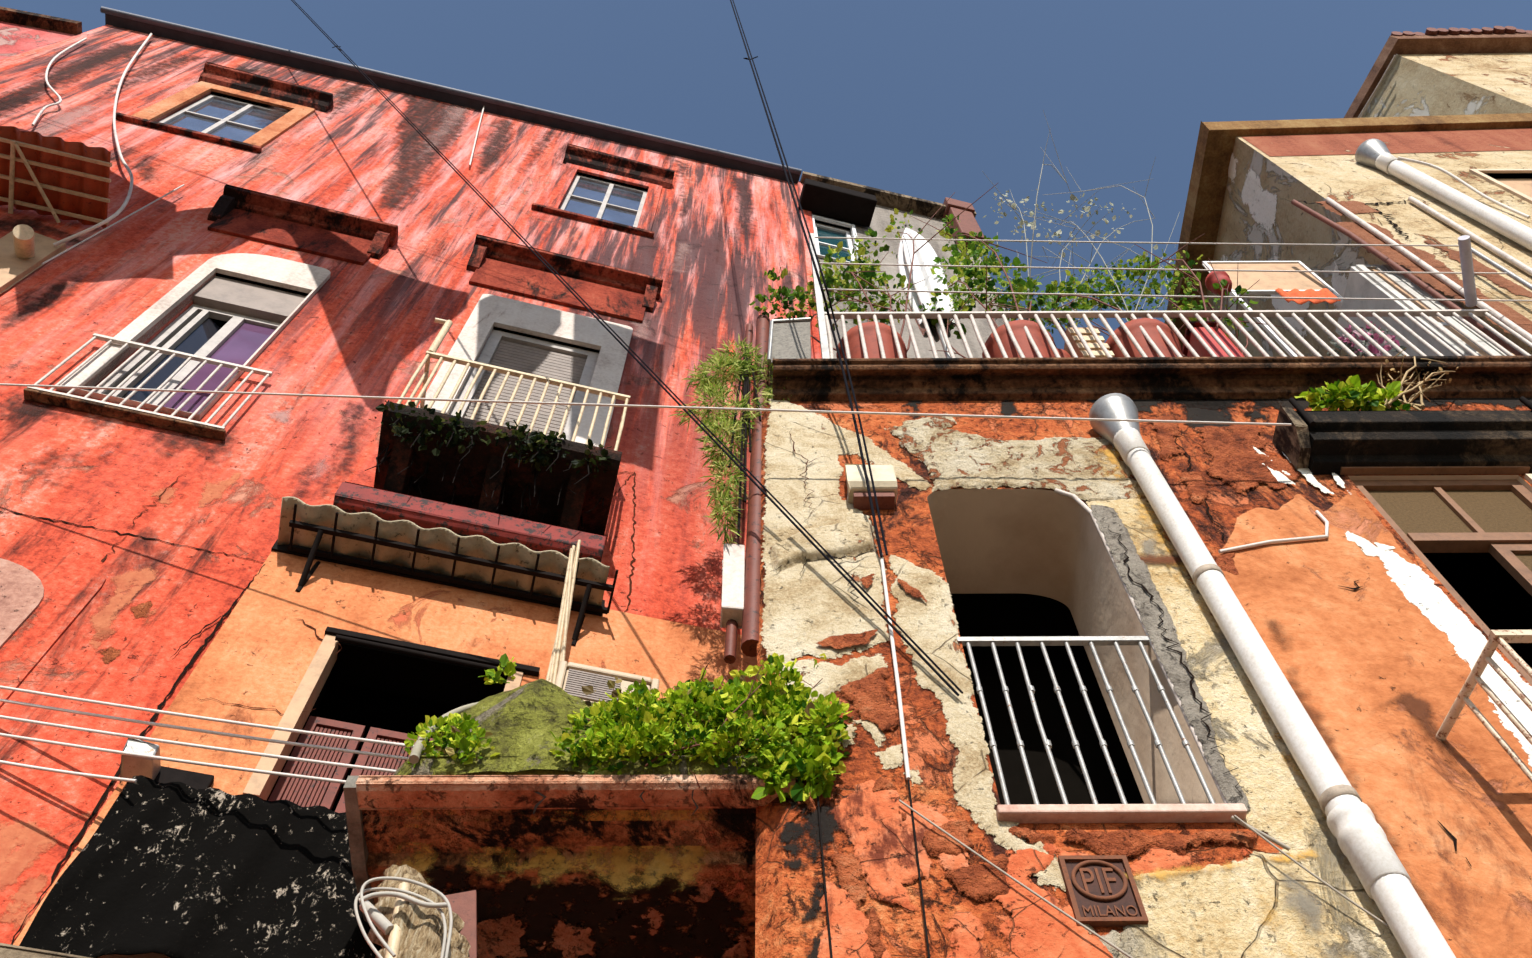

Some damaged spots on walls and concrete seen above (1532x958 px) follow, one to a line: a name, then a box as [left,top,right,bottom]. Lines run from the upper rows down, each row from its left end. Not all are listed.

leakage [0,43,209,133]
leakage [332,84,366,114]
leakage [380,95,467,209]
leakage [479,120,512,174]
leakage [0,218,81,243]
leakage [4,276,82,327]
crack [615,471,636,612]
crack [0,476,316,945]
crack [294,618,342,654]
flaking render [760,397,1406,958]
peeling [1345,531,1532,766]
leakage [425,864,755,958]